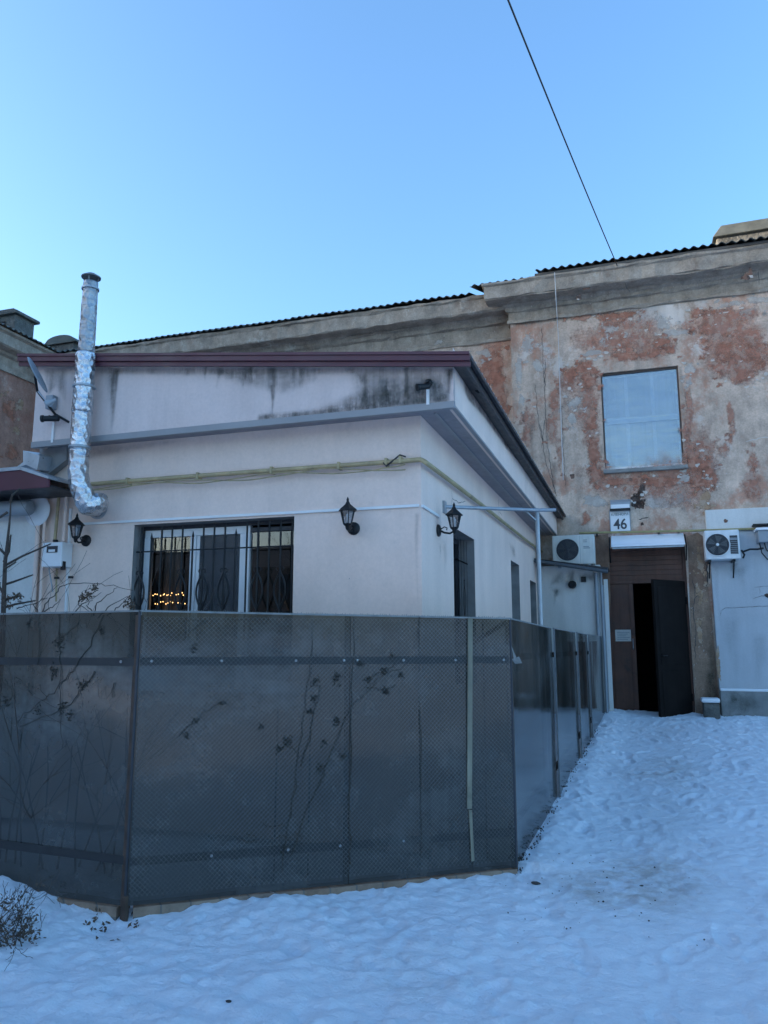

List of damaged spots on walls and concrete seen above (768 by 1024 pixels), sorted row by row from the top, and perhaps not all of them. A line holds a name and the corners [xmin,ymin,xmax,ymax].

peeling [469,294,768,525]